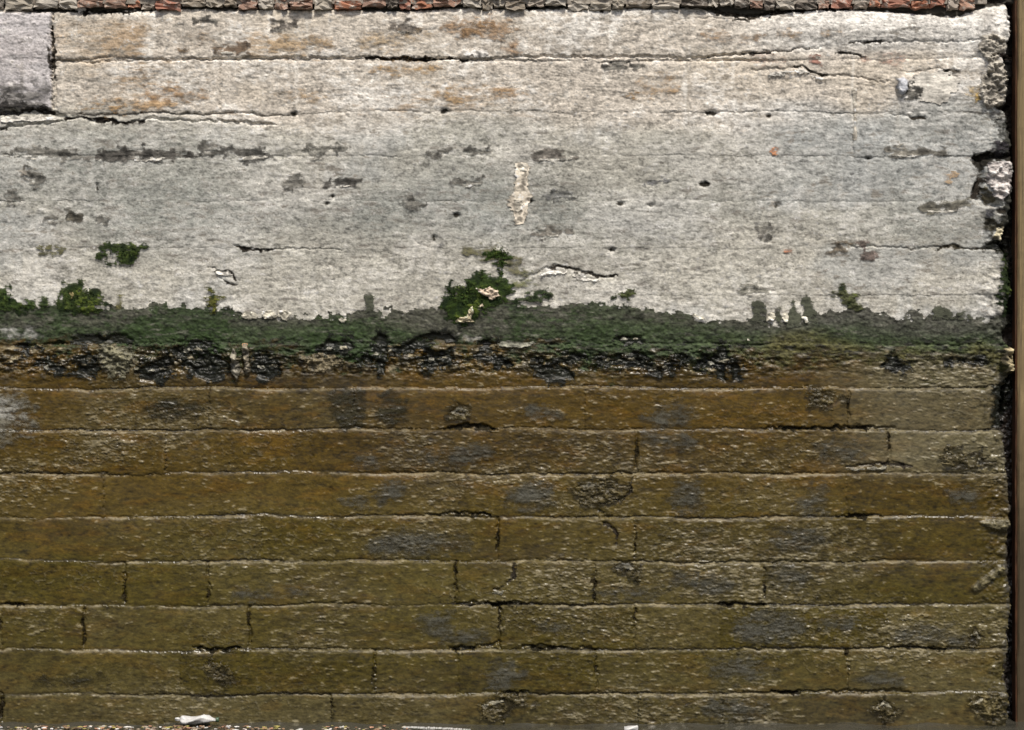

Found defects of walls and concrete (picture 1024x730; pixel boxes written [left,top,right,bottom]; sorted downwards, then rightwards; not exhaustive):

crack [741,40,883,80]
crack [0,107,145,131]
peeling [507,148,579,241]
crack [539,264,618,283]
crack [935,244,996,252]
spalling [13,330,286,388]
spalling [300,318,459,378]
spalling [472,335,750,387]
crack [454,511,522,627]